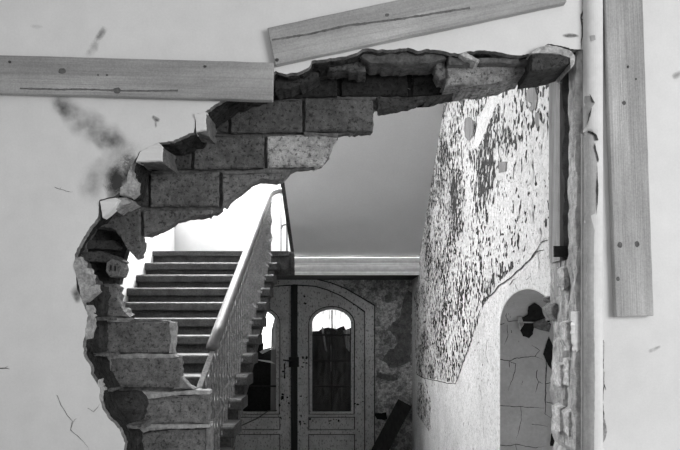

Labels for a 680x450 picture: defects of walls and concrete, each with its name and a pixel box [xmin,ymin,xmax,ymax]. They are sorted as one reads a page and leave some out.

flaking render [74,45,575,450]
crack [417,240,551,449]
peeling [511,95,599,450]